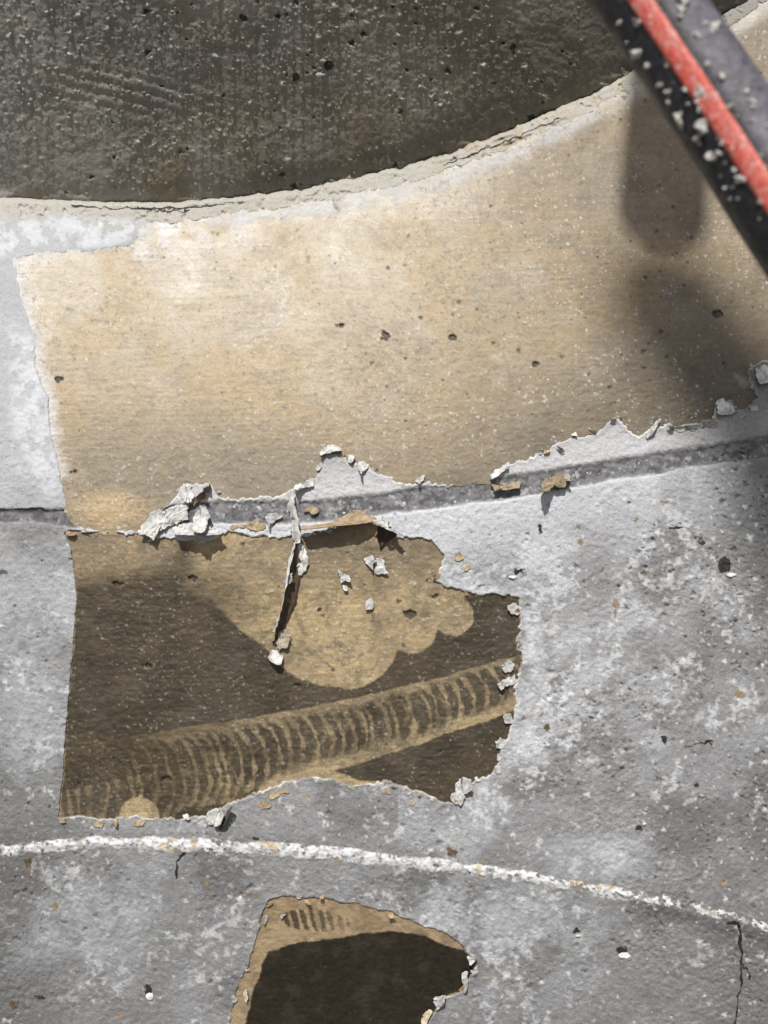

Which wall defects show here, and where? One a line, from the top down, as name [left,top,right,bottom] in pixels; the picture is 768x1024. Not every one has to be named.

peeling [730,0,768,82]
crack [447,117,560,164]
peeling [13,83,768,830]
peeling [230,894,478,1024]
crack [726,921,751,1024]